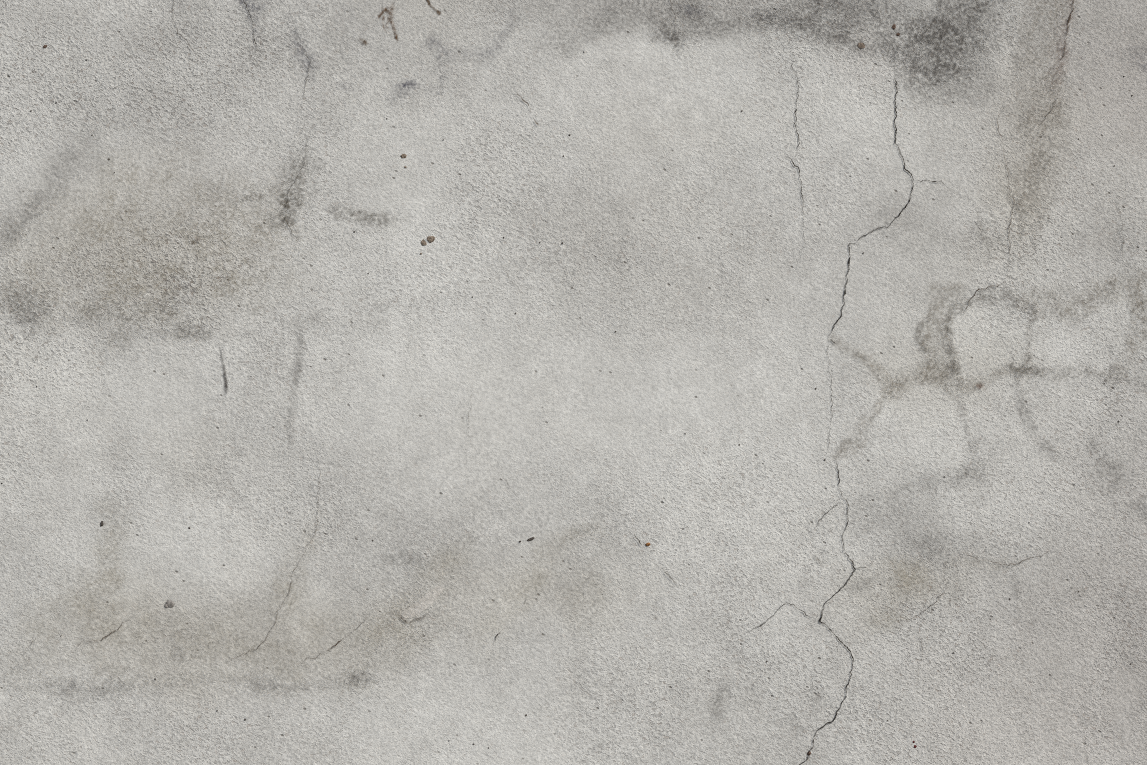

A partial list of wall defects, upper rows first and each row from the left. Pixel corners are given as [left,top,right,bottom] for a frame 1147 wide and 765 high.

water stain [889,2,982,82]
crack [831,80,943,343]
crack [753,464,866,765]